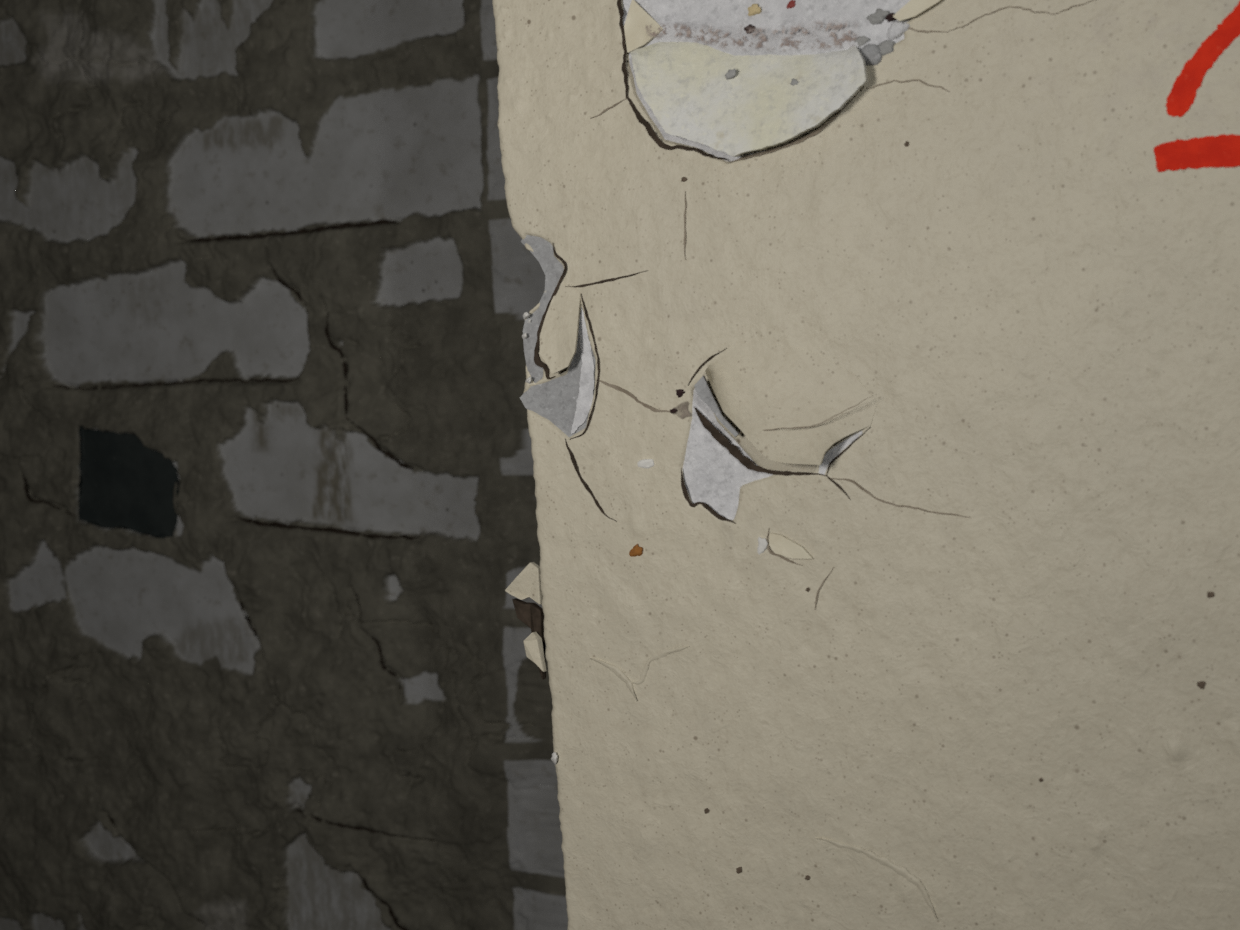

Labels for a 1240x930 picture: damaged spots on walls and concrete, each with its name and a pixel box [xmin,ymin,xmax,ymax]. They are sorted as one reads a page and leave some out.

peeling [592,0,1093,162]
peeling [520,235,966,524]
peeling [767,528,813,566]